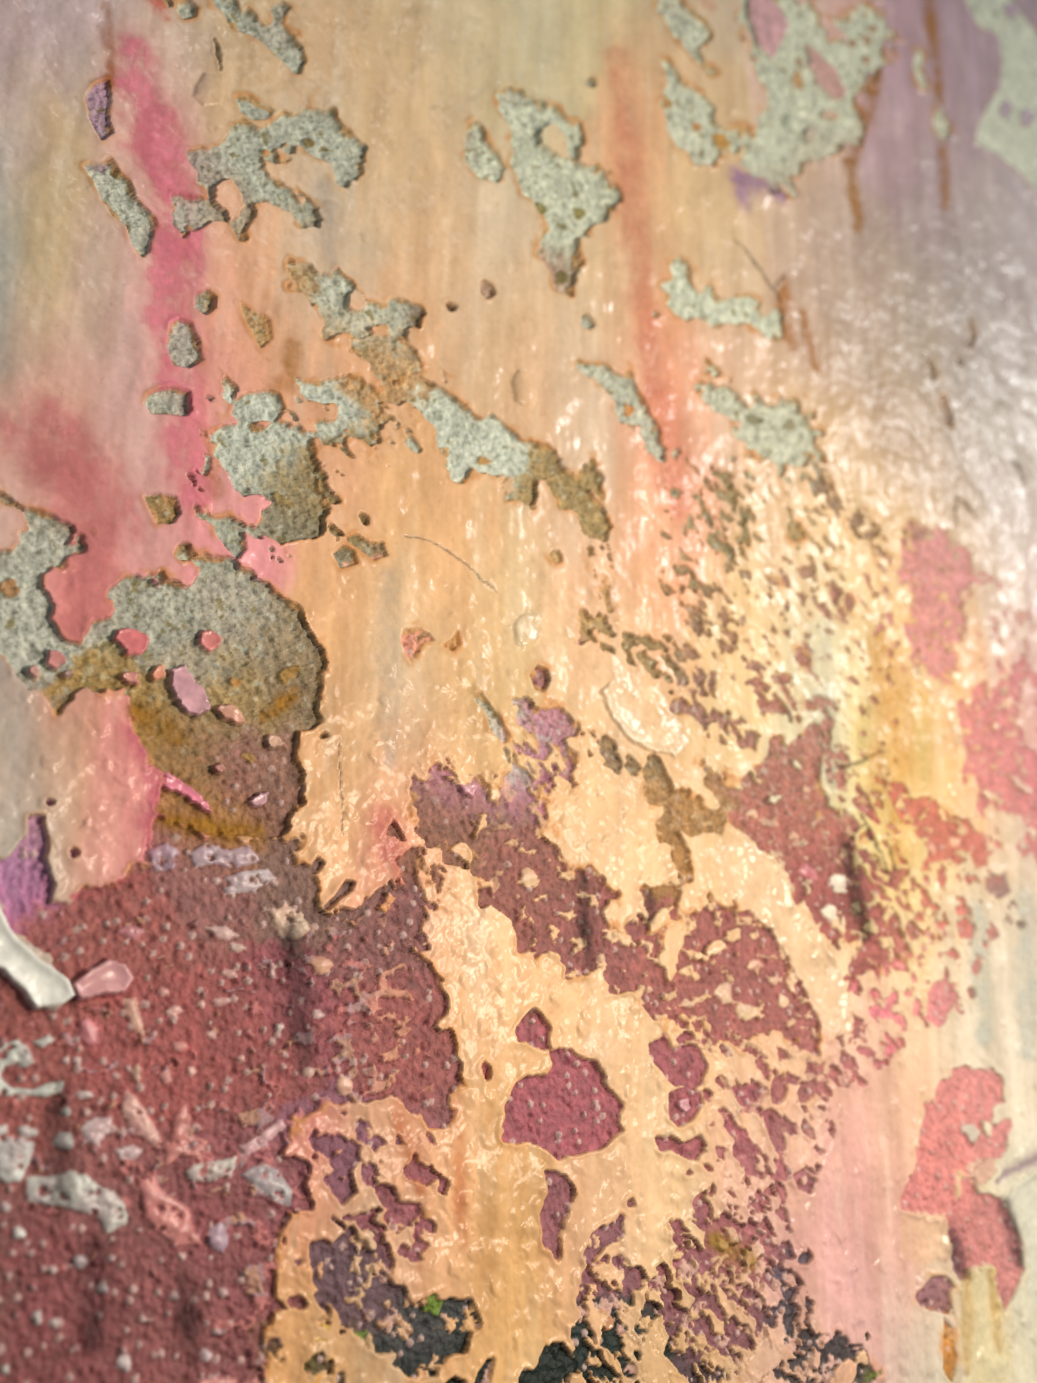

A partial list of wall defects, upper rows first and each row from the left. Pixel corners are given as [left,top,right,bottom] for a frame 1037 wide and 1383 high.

peeling [82,77,369,260]
peeling [463,82,625,299]
peeling [653,0,955,200]
peeling [965,0,1037,191]
peeling [0,253,968,1383]
peeling [971,951,987,977]